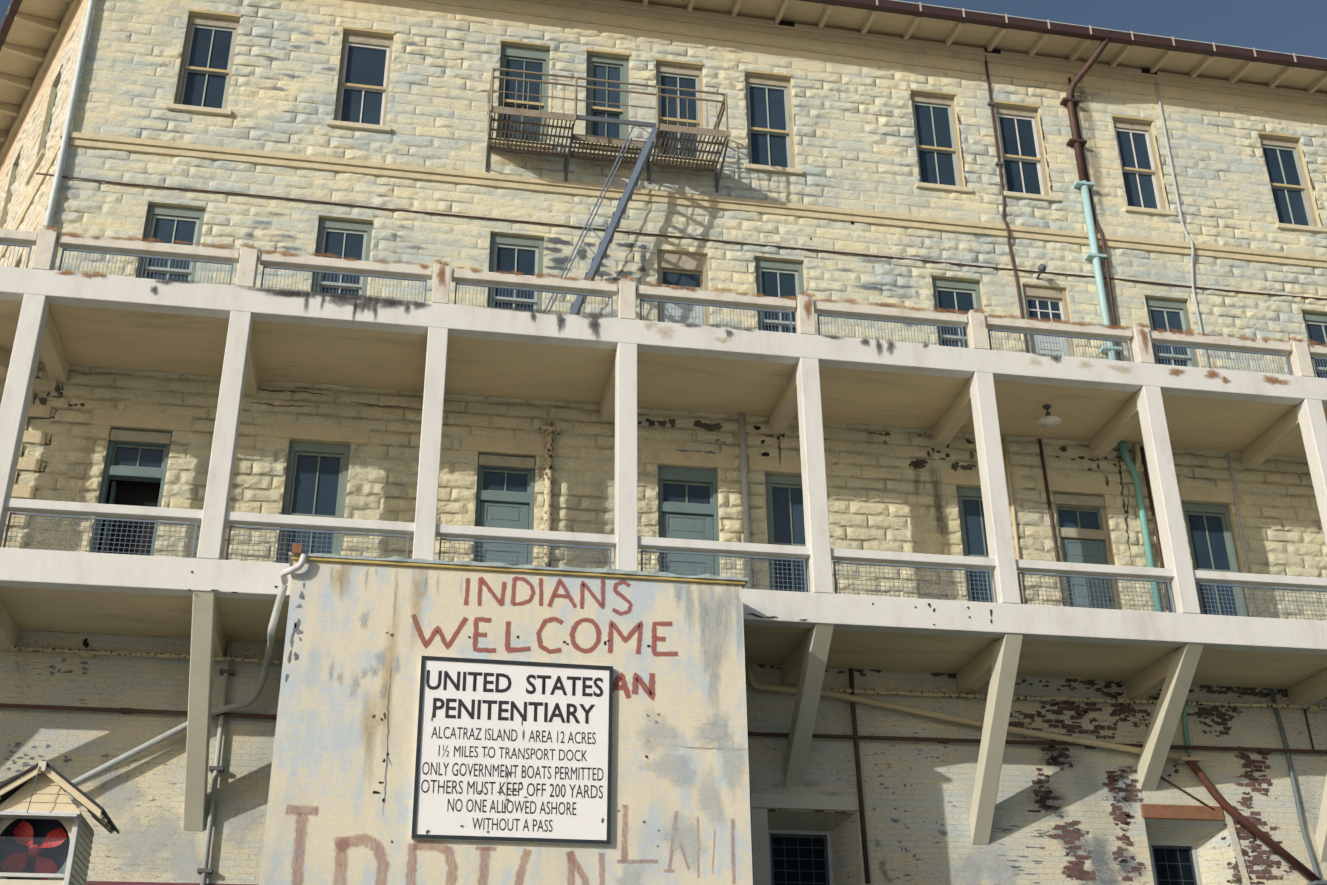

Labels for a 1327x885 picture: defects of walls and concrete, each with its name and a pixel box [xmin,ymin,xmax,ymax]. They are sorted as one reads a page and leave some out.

peeling [543,237,595,270]
peeling [597,242,648,280]
spalling [637,418,676,428]
spalling [676,420,726,454]
spalling [909,439,976,471]
peeling [994,679,1162,885]
peeling [1187,685,1297,884]
damp [1034,792,1137,885]